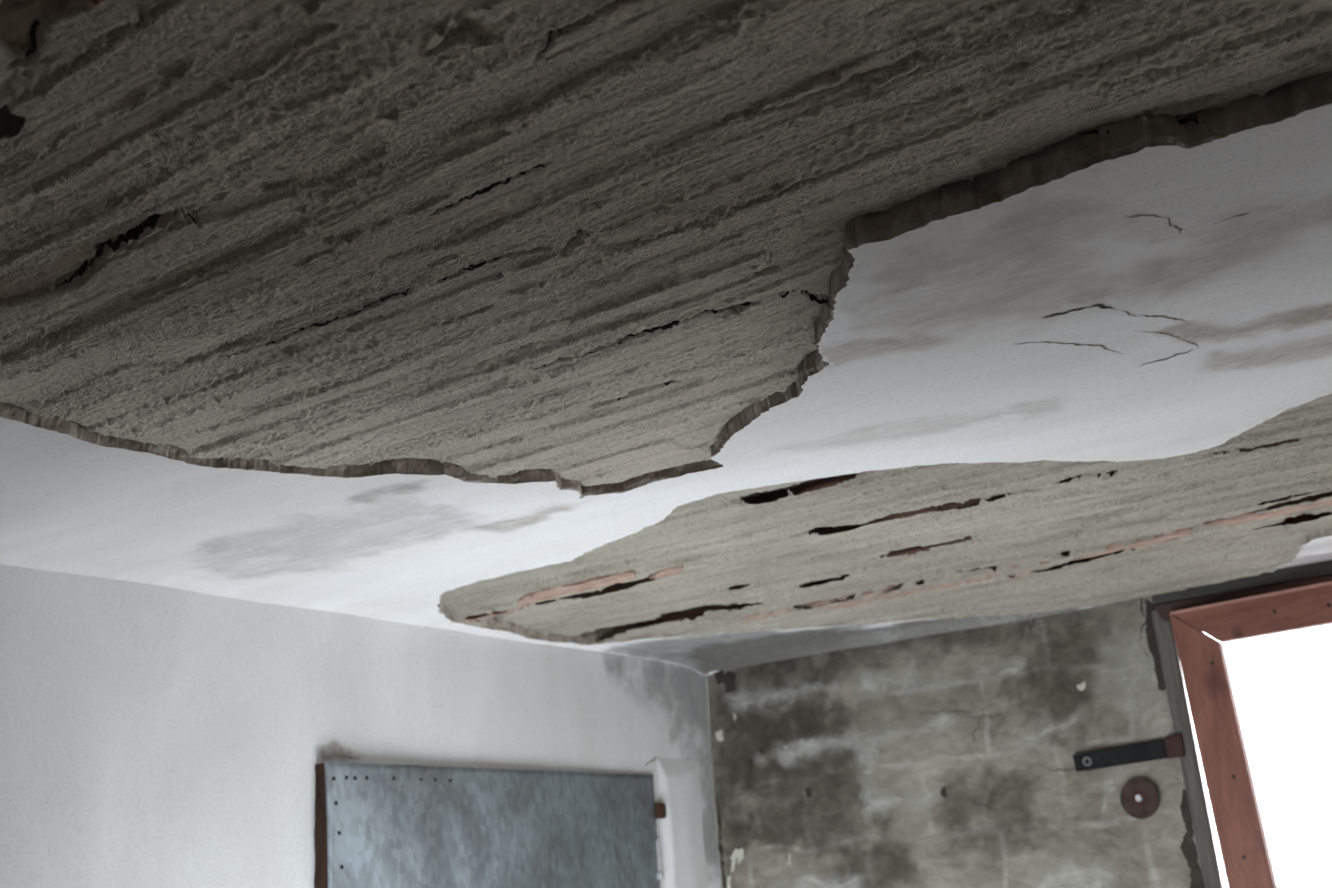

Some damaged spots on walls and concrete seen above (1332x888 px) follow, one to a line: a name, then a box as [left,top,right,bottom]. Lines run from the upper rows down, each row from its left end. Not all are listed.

spalling [0,0,1332,498]
crack [1124,213,1249,233]
crack [1022,304,1199,365]
crack [745,476,837,497]
spalling [437,393,1332,693]
damp [1108,639,1173,739]
damp [630,597,1143,856]
damp [775,874,868,888]
damp [1036,862,1114,888]